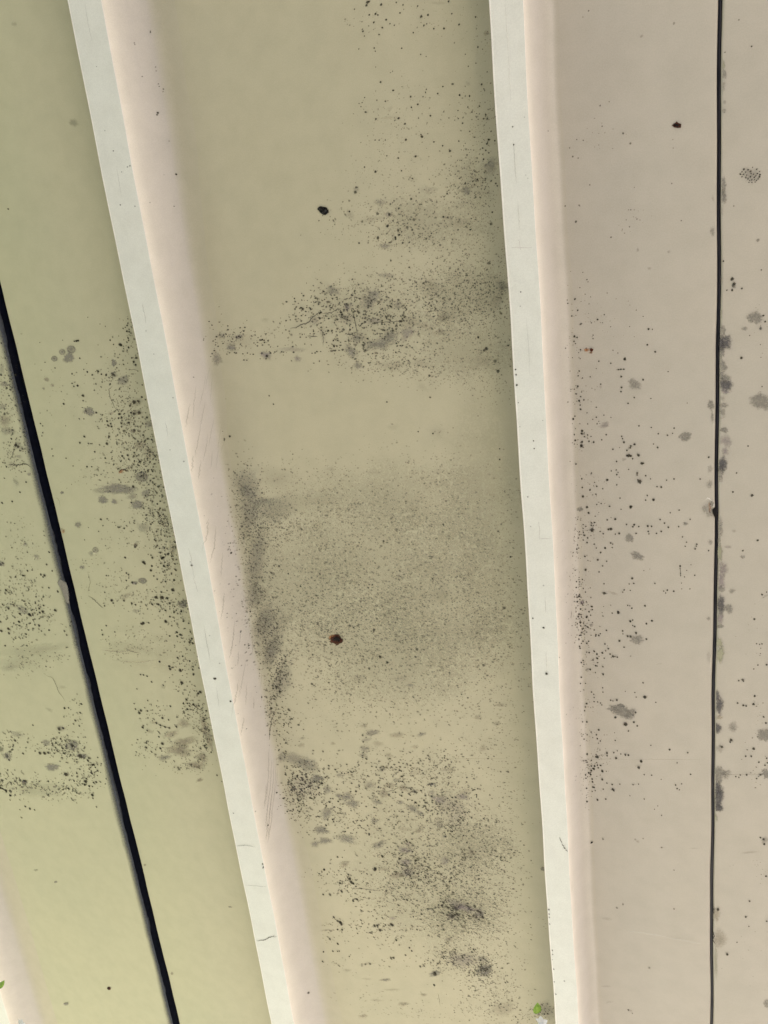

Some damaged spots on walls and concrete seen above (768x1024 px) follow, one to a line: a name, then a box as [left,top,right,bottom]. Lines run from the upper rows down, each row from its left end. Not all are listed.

mould [203,71,511,383]
mould [565,271,644,448]
mould [708,327,732,418]
mould [752,386,768,410]
mould [0,551,59,647]
mould [45,318,212,781]
mould [566,436,735,808]
mould [244,600,526,1006]
mould [715,695,768,820]